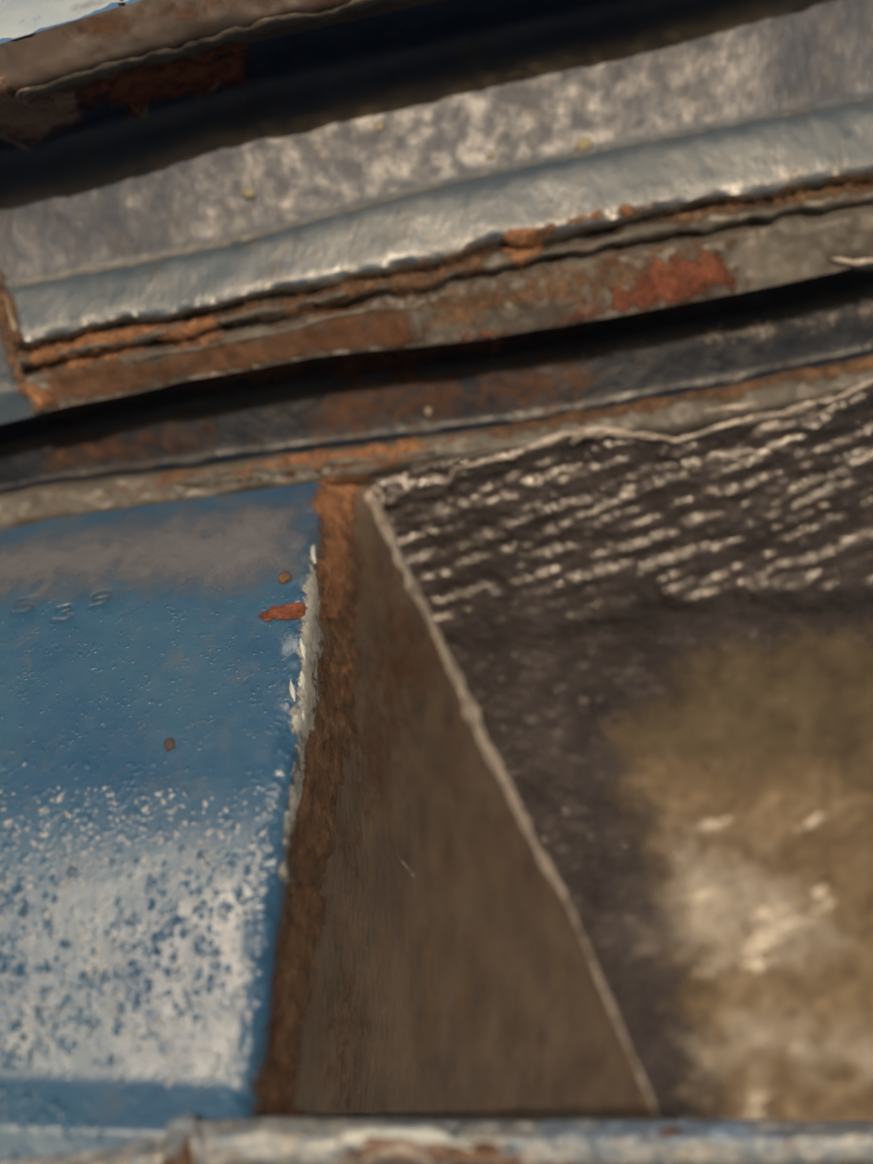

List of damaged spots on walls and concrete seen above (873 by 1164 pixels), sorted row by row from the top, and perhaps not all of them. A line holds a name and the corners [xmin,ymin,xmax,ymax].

peeling [0,0,428,151]
peeling [3,171,493,287]
corrosion [618,170,873,226]
corrosion [142,355,873,1117]
leakage [700,817,729,831]
leakage [796,813,820,831]
leakage [678,855,839,976]